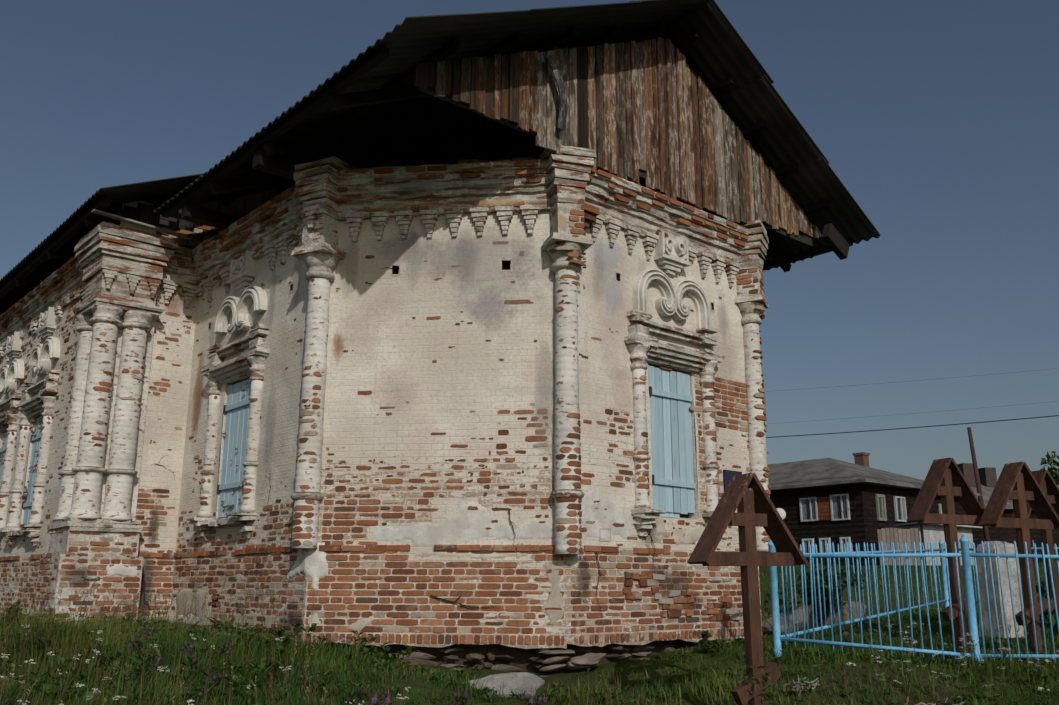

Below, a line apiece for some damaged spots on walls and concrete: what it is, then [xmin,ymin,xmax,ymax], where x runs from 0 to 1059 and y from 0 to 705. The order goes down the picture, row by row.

flaking render [172,188,298,266]
spalling [499,251,524,283]
flaking render [555,167,748,312]
peeling [0,256,767,645]